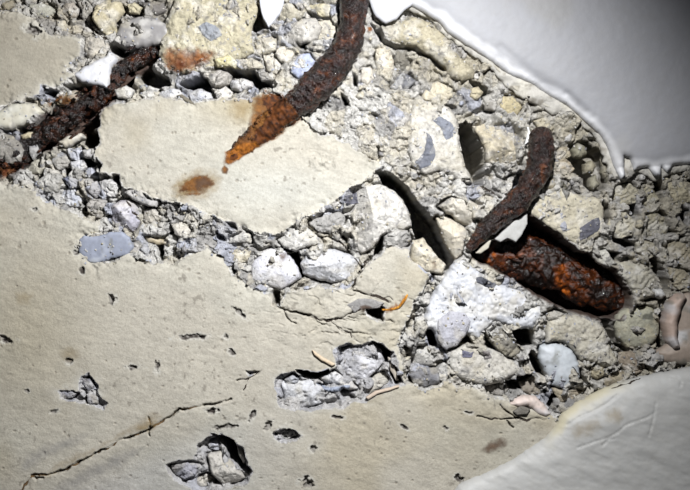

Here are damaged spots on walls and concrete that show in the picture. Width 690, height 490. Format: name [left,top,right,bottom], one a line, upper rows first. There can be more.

spalling [198,0,250,47]
spalling [0,0,188,147]
corrosion [0,45,212,177]
corrosion [222,0,372,173]
corrosion [182,175,214,195]
corrosion [466,126,625,314]
spalling [177,333,211,342]
spalling [364,305,387,324]
spalling [443,285,473,311]
spalling [58,372,108,411]
crack [22,406,198,490]
spalling [165,423,254,490]